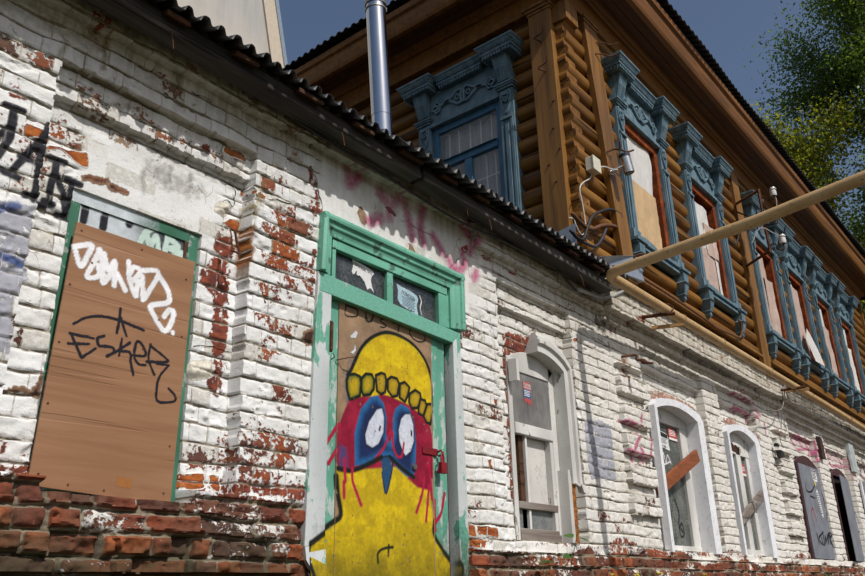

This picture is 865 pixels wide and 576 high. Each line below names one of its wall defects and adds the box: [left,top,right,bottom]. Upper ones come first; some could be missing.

peeling [22,122,129,196]
peeling [222,146,247,162]
peeling [308,166,323,216]
peeling [199,218,240,397]
peeling [293,249,317,300]
spalling [301,328,313,346]
peeling [493,331,530,505]
peeling [176,415,305,507]